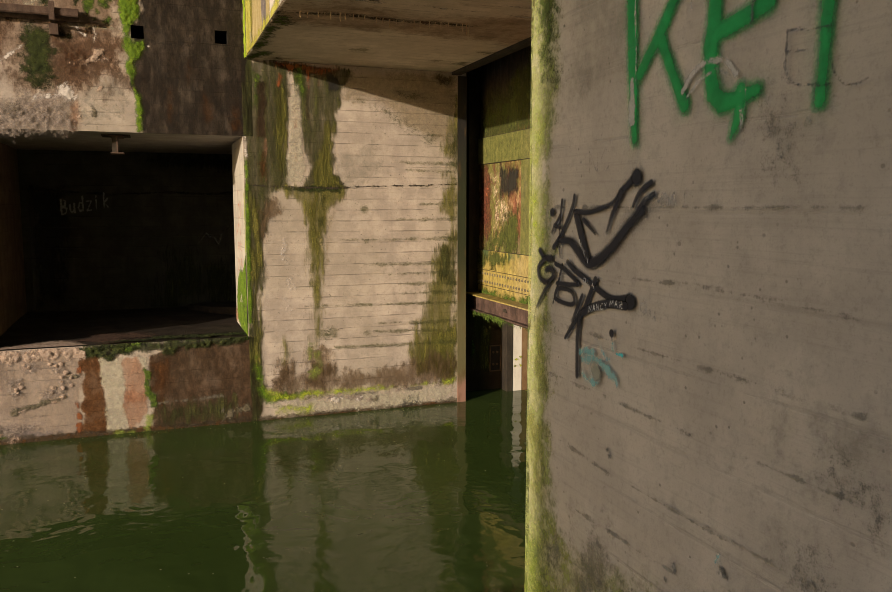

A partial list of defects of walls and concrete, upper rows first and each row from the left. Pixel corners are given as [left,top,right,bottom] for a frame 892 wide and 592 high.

water stain [33,83,77,101]
water stain [286,83,305,182]
corrosion [479,165,492,248]
corrosion [75,357,108,435]
water stain [0,339,457,445]